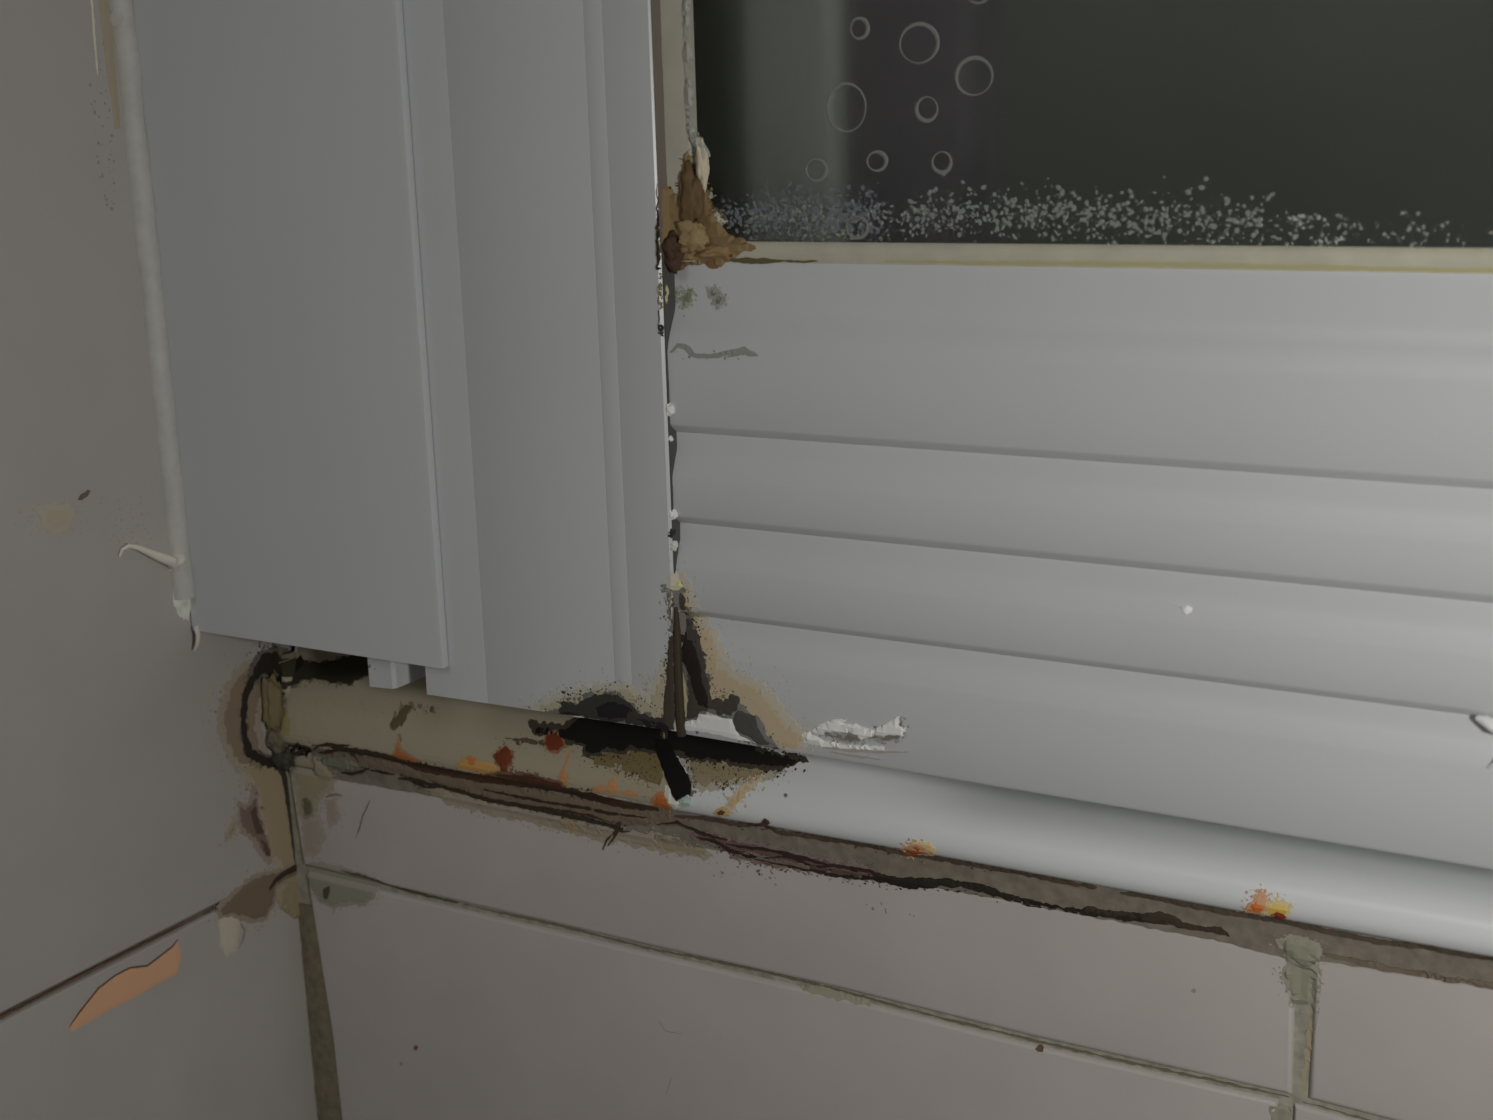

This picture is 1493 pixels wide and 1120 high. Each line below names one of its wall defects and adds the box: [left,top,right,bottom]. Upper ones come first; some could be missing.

crack [269,768,297,890]
corrosion [377,724,674,814]
damp [202,641,887,888]
damp [495,559,817,807]
peeling [802,714,906,751]
crack [331,738,1493,988]
corrosion [896,838,935,864]
corrosion [1236,884,1296,919]
peeling [69,941,181,1032]
crack [341,870,1370,1120]